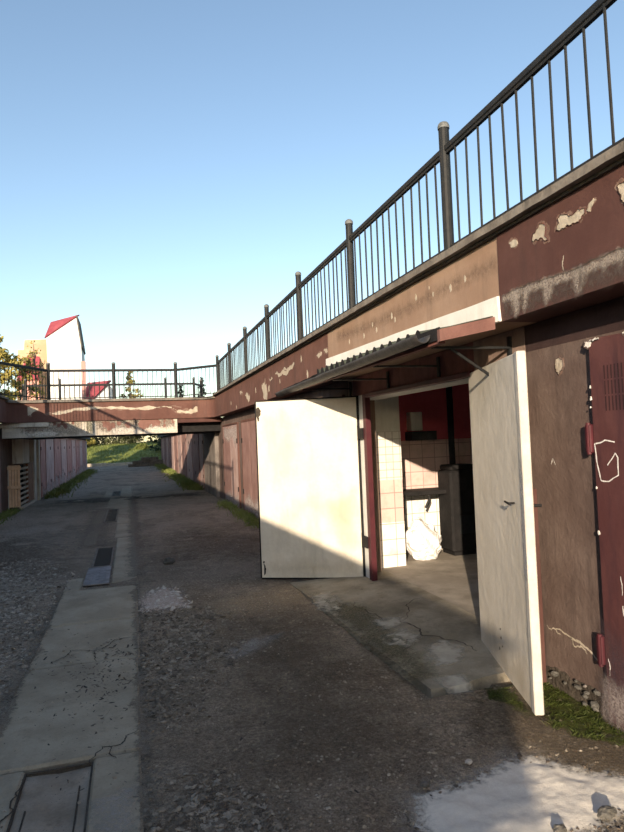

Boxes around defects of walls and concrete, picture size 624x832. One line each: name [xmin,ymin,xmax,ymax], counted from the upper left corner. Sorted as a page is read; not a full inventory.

peeling [614,177,624,205]
peeling [532,197,597,245]
damp [502,247,624,316]
peeling [240,357,302,402]
peeling [25,405,198,437]
crack [354,597,476,651]
crack [89,729,139,764]
crack [0,779,24,822]